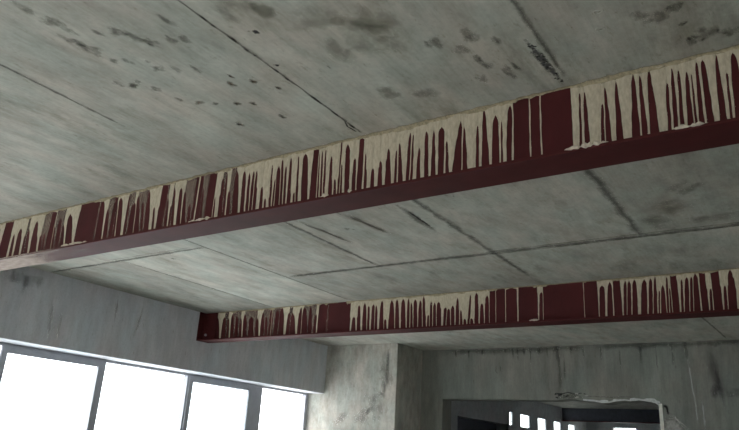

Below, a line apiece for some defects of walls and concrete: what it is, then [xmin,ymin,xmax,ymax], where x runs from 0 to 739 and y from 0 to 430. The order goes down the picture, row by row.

crack [178,0,360,132]
leakage [0,44,739,271]